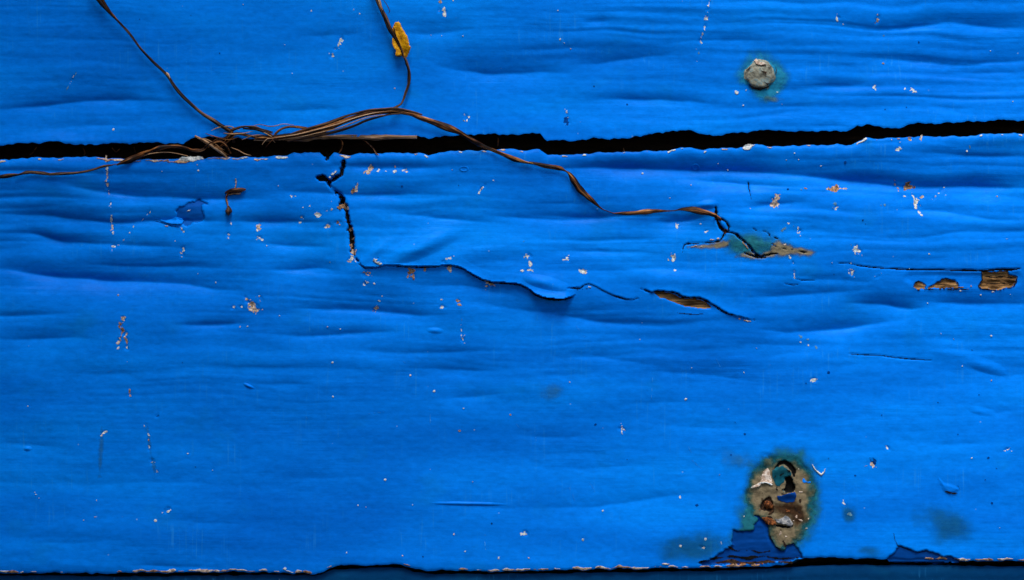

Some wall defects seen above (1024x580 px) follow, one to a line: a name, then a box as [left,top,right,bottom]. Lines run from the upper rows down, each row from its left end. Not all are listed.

crack [316,151,359,262]
crack [682,207,806,259]
crack [570,284,635,300]
peeling [644,289,751,322]
peeling [848,245,1020,296]
peeling [699,456,829,567]
peeling [573,563,686,571]